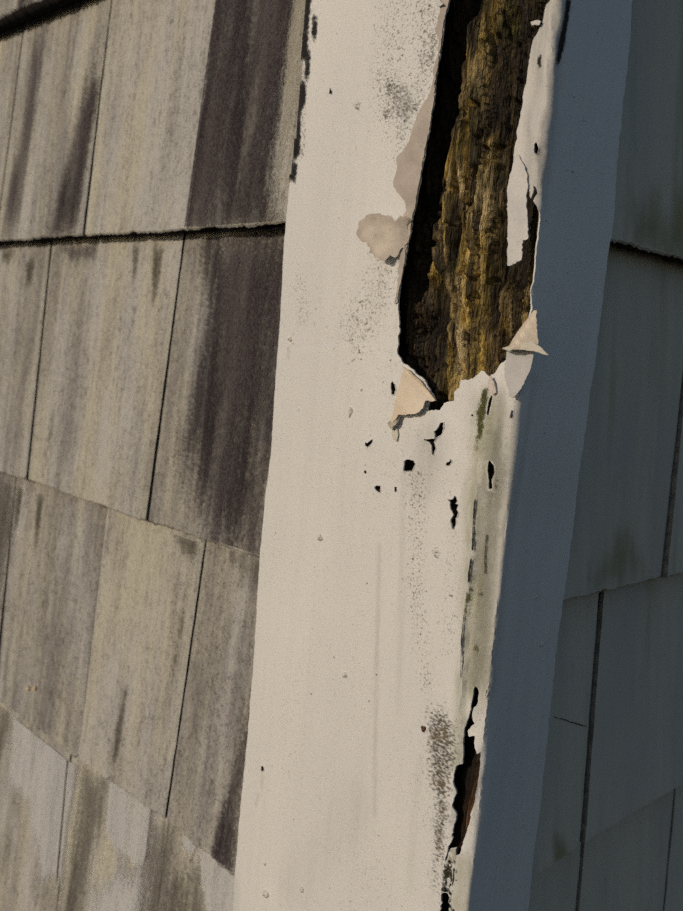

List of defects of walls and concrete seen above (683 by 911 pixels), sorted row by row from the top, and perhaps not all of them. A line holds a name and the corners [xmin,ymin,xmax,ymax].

water stain [0,0,75,231]
water stain [48,71,99,235]
water stain [151,244,163,300]
water stain [172,0,317,592]
peeling [356,0,450,304]
peeling [388,366,436,441]
peeling [507,154,529,266]
peeling [488,310,549,398]
water stain [65,771,104,911]
water stain [112,691,126,762]
water stain [211,696,250,872]
water stain [427,712,457,911]